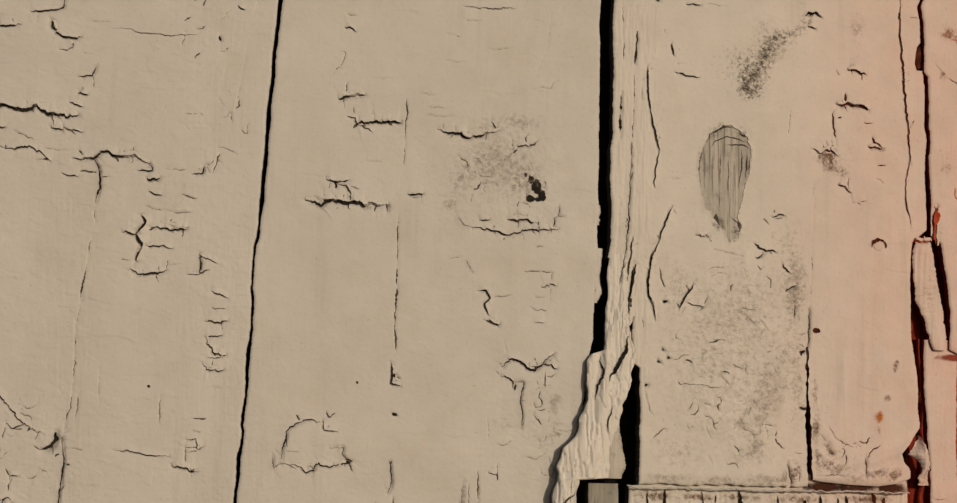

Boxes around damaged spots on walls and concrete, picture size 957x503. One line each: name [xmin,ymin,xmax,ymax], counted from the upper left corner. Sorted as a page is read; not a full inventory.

crack [69,64,97,107]
crack [664,30,700,78]
crack [147,89,249,211]
crack [454,135,565,247]
peeling [695,122,754,245]
crack [392,222,400,349]
crack [449,257,512,326]
peeling [629,237,639,325]
crack [622,206,813,373]
crack [0,241,100,503]
crack [461,374,571,503]
crack [645,334,879,487]